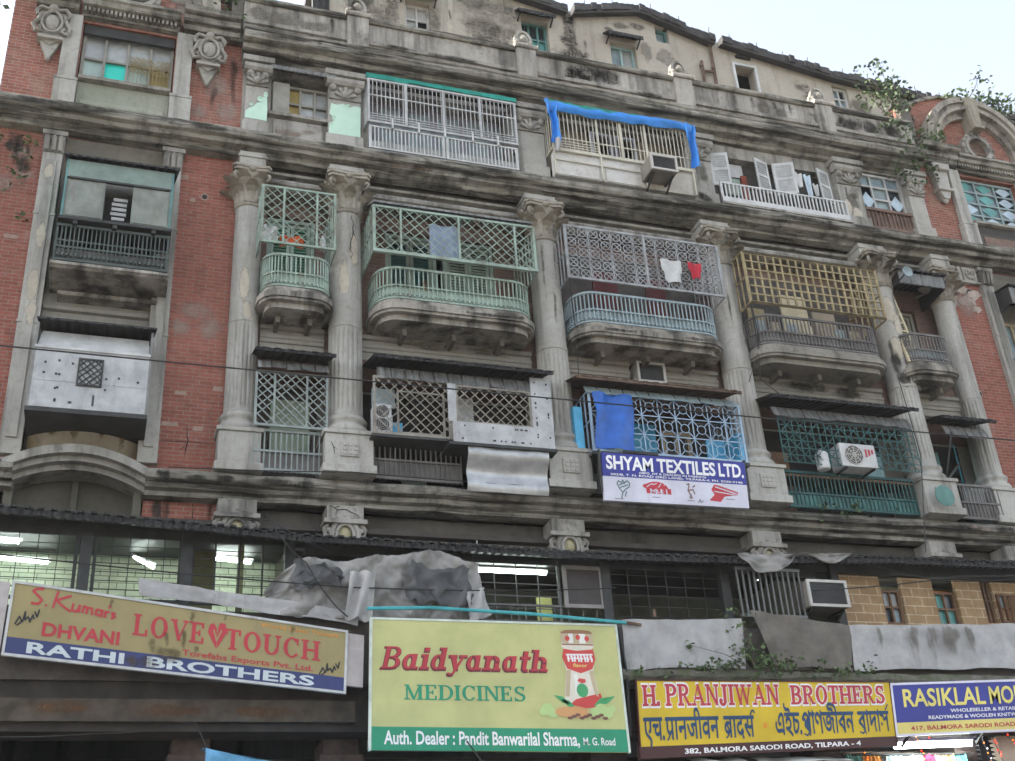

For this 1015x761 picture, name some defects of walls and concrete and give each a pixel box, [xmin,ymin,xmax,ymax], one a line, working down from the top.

water stain [458,0,514,44]
water stain [561,14,619,85]
peeling [245,91,268,121]
peeling [329,103,361,137]
water stain [0,132,32,190]
peeling [952,286,982,315]
water stain [910,626,975,652]